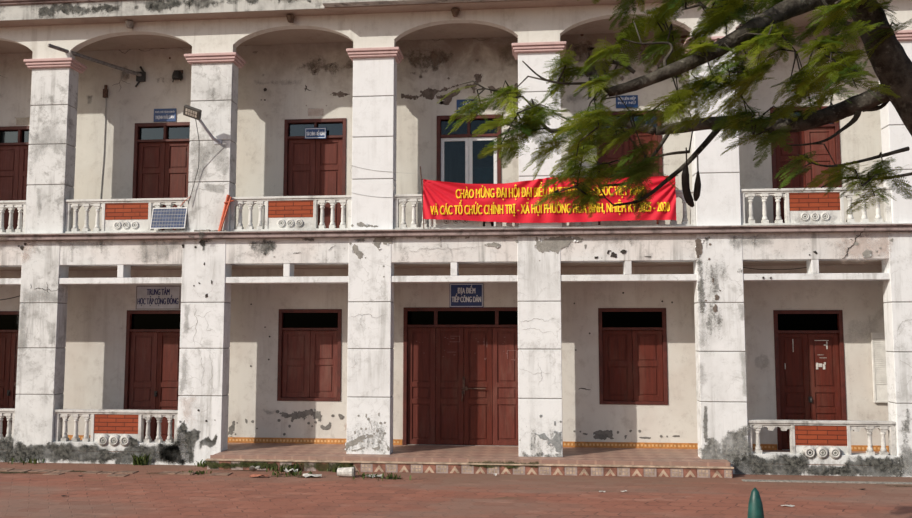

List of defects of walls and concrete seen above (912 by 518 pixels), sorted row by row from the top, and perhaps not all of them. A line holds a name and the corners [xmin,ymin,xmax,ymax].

water stain [38,3,119,16]
water stain [135,0,258,12]
peeling [401,74,518,105]
peeling [535,235,586,261]
water stain [0,421,217,465]
peeling [276,409,344,436]
peeling [536,421,562,452]
peeling [573,430,680,440]
water stain [698,406,912,477]